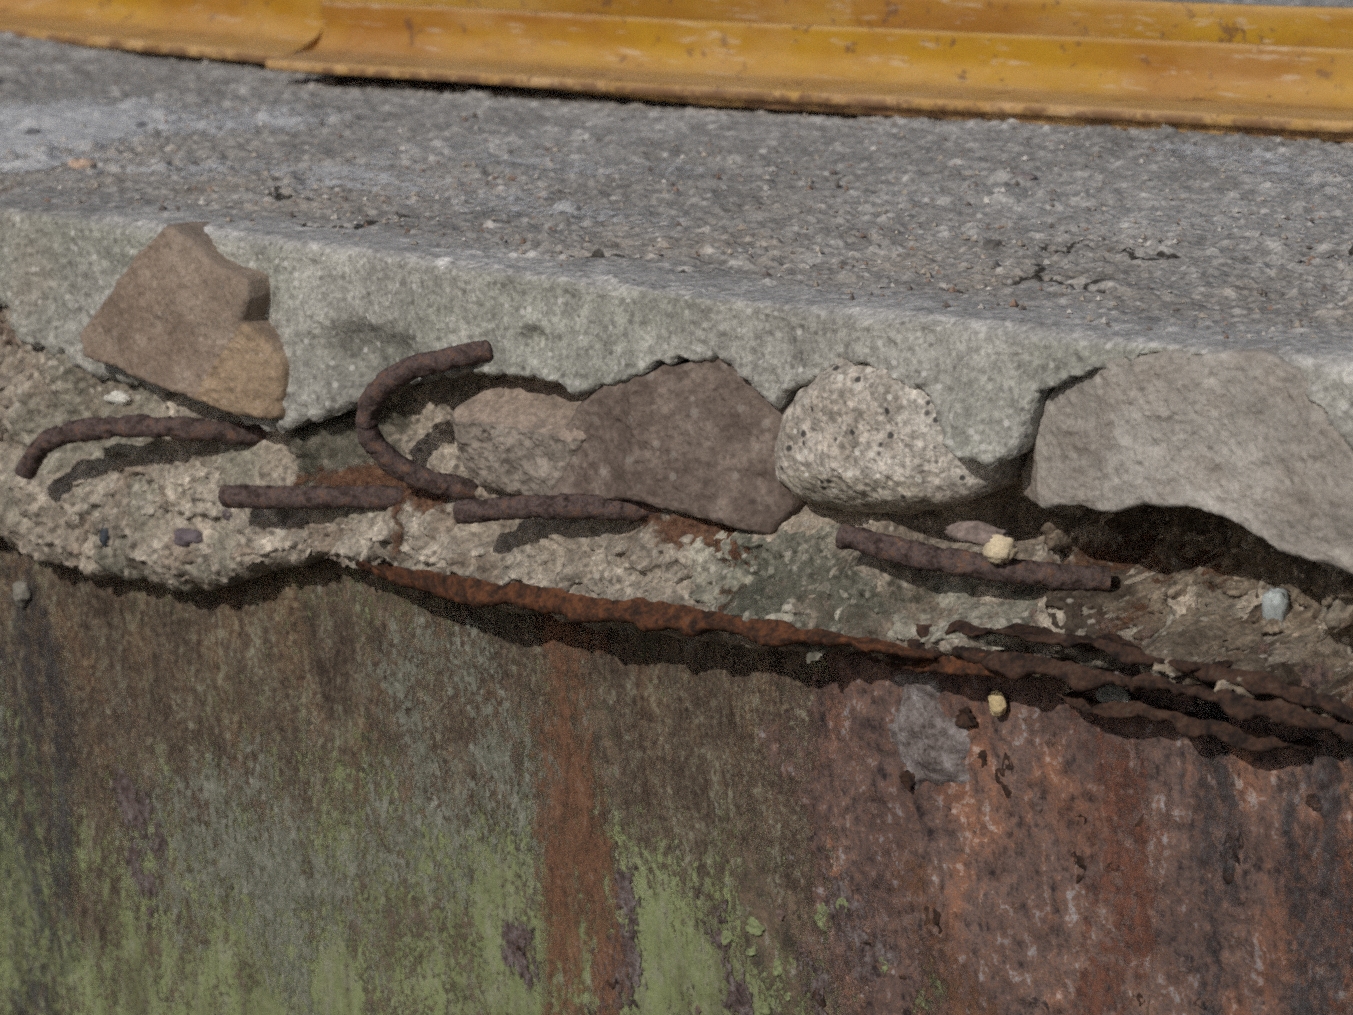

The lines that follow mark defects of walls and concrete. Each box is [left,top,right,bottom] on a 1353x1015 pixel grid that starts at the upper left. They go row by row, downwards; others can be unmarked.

spalling [0,304,34,442]
spalling [8,454,491,583]
corrosion [293,463,449,554]
corrosion [642,509,756,568]
spalling [500,505,1353,718]
leakage [0,550,81,1015]
peeling [109,750,168,929]
leakage [116,609,567,1015]
corrosion [0,529,1353,1015]
peeling [500,917,540,988]